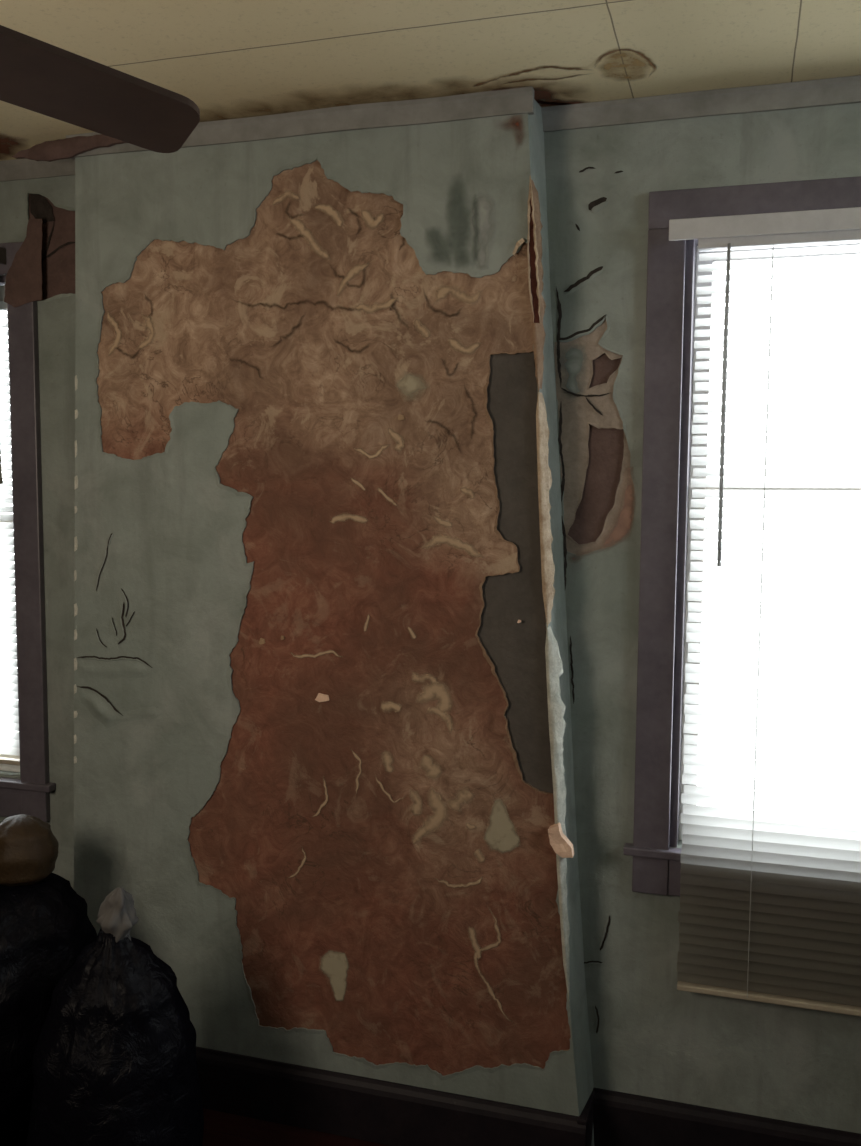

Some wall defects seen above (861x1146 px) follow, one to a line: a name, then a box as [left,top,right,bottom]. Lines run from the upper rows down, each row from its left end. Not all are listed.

damp [449,66,583,96]
damp [596,49,656,79]
crack [575,167,623,231]
crack [512,176,609,589]
peeling [94,156,638,1080]
crack [568,636,576,704]